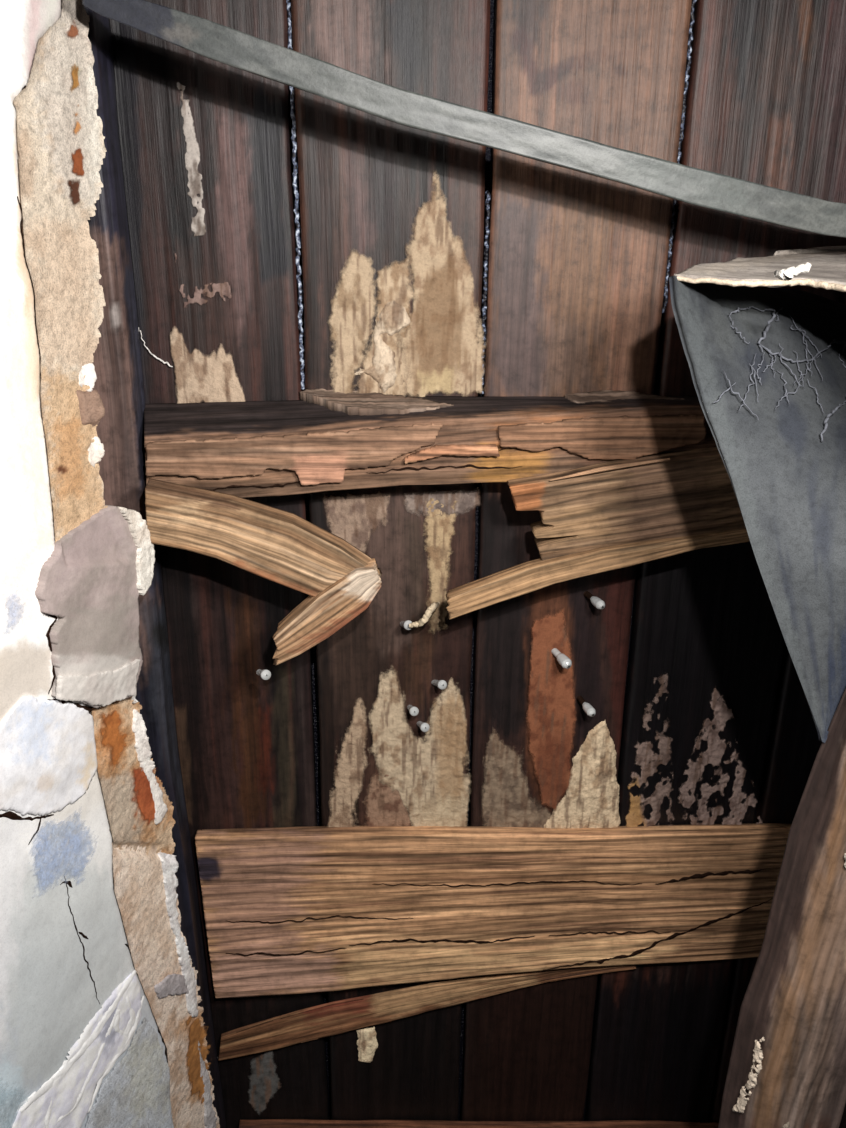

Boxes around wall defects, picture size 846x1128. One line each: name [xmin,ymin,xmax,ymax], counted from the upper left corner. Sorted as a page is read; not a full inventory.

spalling [0,0,220,1128]
corrosion [101,711,127,767]
corrosion [132,768,156,825]
crack [60,876,100,1004]